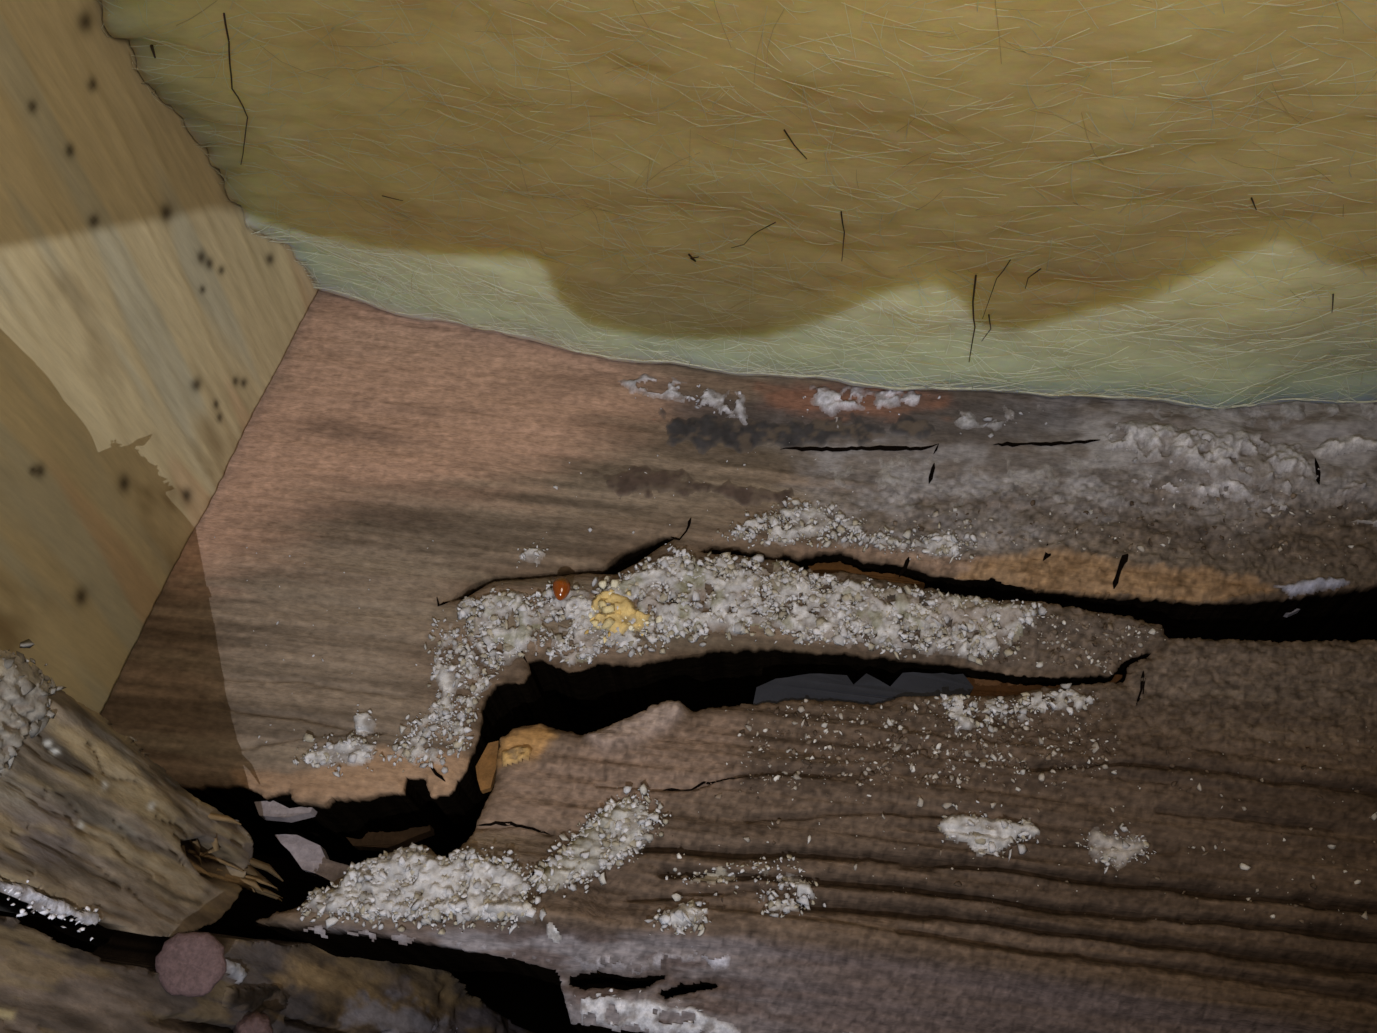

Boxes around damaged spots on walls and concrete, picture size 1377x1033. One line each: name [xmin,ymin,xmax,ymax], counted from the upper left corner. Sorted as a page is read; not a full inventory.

water stain [996,401,1377,530]
crack [671,518,691,540]
crack [1113,554,1129,589]
crack [1337,627,1377,643]
crack [686,680,754,712]
crack [1136,671,1146,706]
crack [508,694,640,735]
crack [662,776,745,791]
crack [195,768,550,941]
crack [49,919,118,947]
water stain [304,925,328,939]
water stain [347,929,416,945]